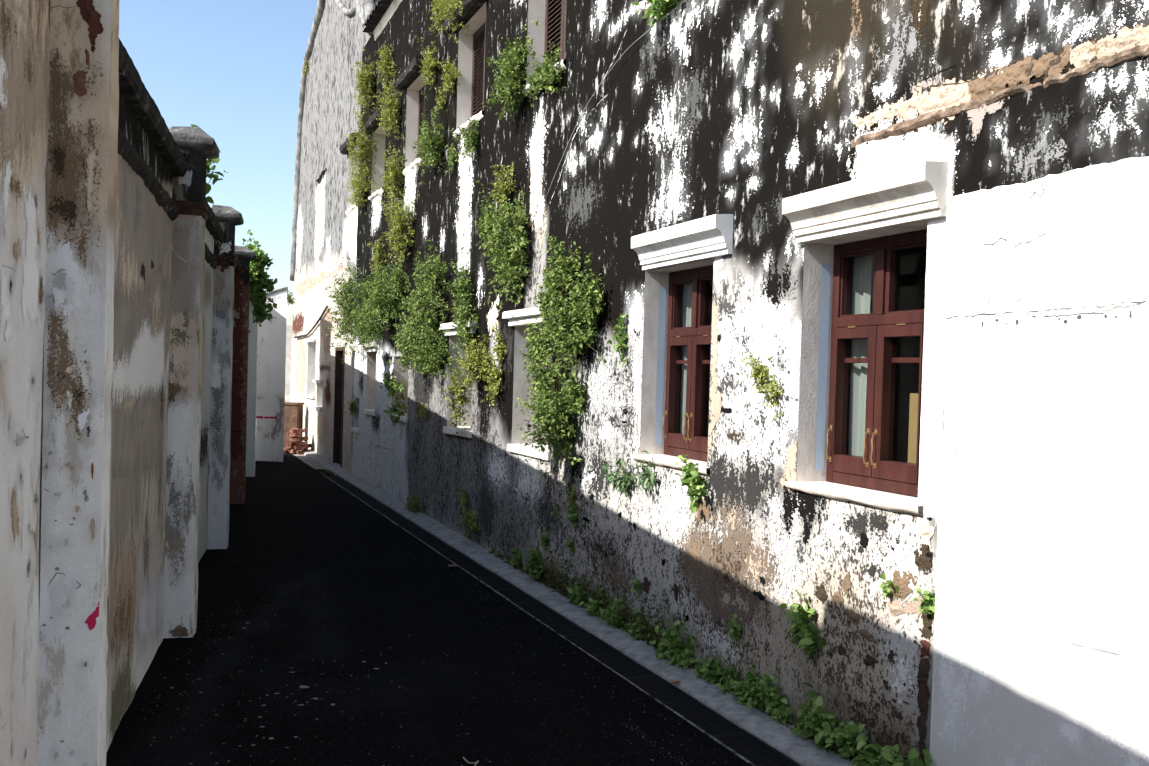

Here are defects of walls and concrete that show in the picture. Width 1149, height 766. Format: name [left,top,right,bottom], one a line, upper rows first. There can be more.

damp [0,0,106,277]
spalling [66,0,104,133]
mould [640,22,678,82]
damp [676,55,713,144]
peeling [794,59,833,112]
damp [561,170,603,233]
crack [946,297,1147,319]
damp [32,159,239,745]
damp [676,408,830,642]
mould [842,507,888,540]
spalling [761,489,935,763]
peeling [1055,684,1149,766]